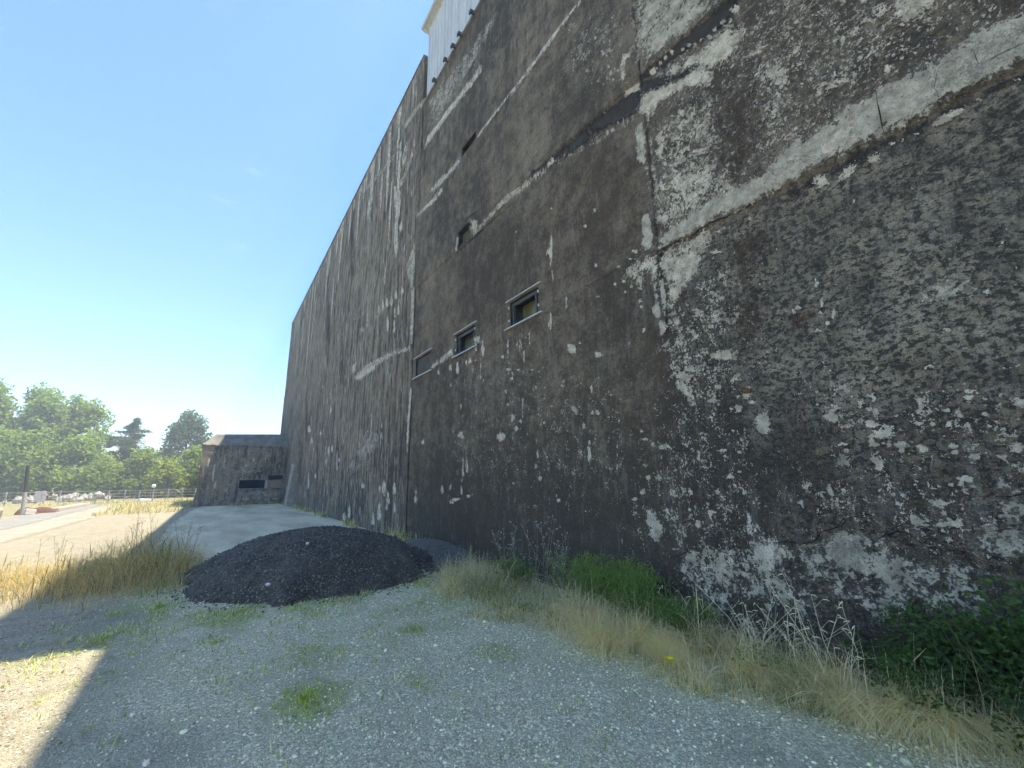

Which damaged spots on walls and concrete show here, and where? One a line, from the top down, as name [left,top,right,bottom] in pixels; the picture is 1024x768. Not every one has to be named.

leakage [518,0,738,195]
leakage [829,137,894,176]
leakage [743,505,815,600]
crack [774,516,922,544]